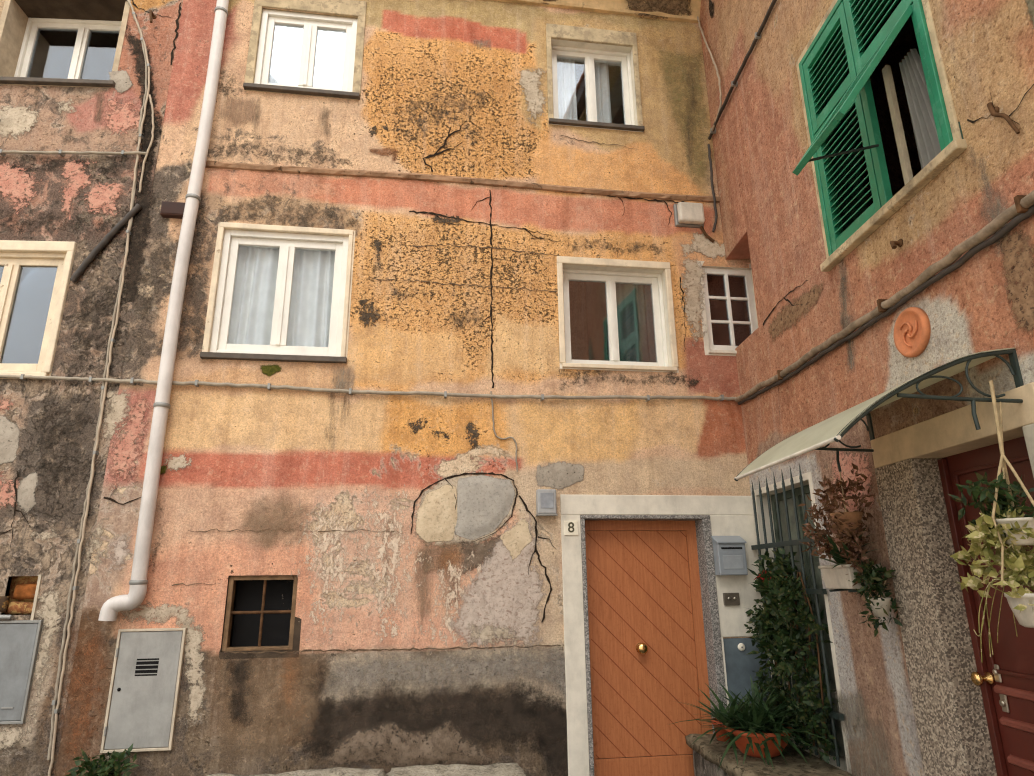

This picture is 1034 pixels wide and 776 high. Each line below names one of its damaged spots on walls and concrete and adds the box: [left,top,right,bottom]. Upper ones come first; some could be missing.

crack [132,0,182,65]
peeling [517,69,547,125]
leakage [0,158,118,173]
crack [423,120,467,172]
mould [0,210,110,236]
crack [560,191,685,225]
crack [366,190,561,388]
crack [1,471,30,547]
crack [103,497,141,505]
crack [188,472,561,654]
spalling [0,575,42,620]
leakage [221,660,568,776]